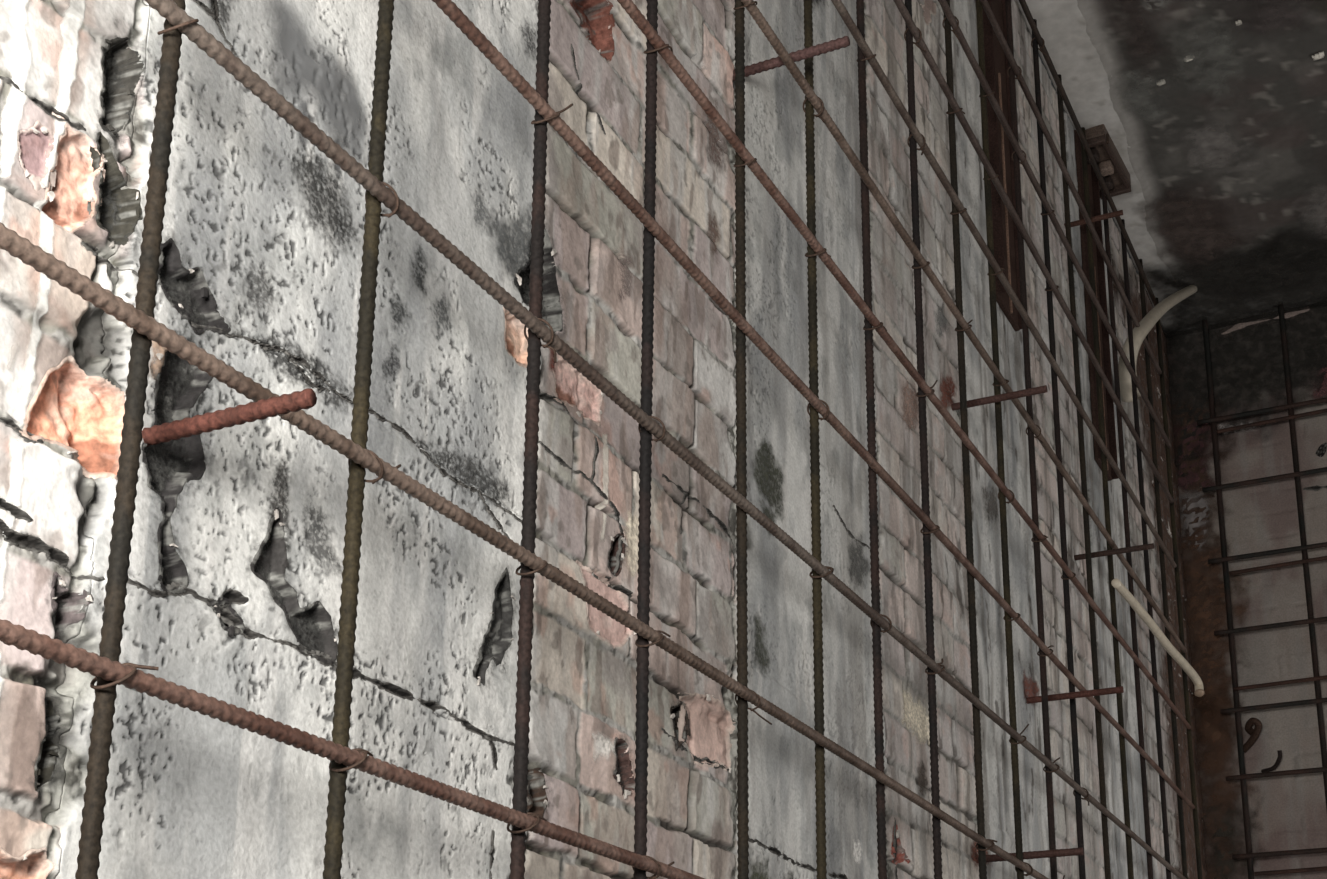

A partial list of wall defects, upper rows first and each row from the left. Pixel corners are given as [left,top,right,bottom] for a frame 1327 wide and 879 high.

leakage [1118,0,1245,119]
leakage [1184,123,1258,168]
crack [191,321,522,539]
spalling [0,0,997,879]
spalling [917,0,1203,879]
crack [0,498,515,770]